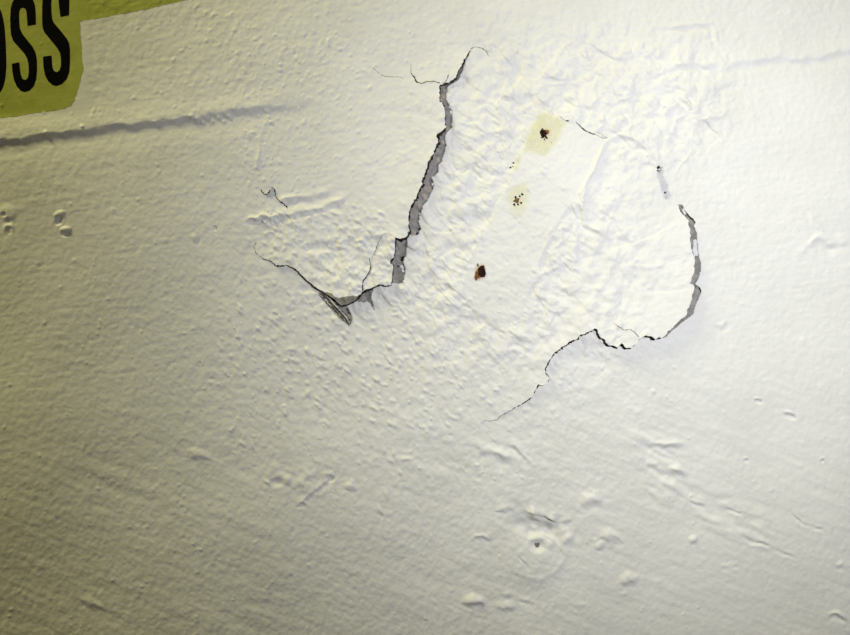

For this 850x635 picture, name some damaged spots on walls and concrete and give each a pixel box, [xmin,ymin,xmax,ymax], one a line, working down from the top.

crack [254,47,489,325]
corrosion [474,263,486,280]
corrosion [530,121,561,150]
crack [484,205,701,421]